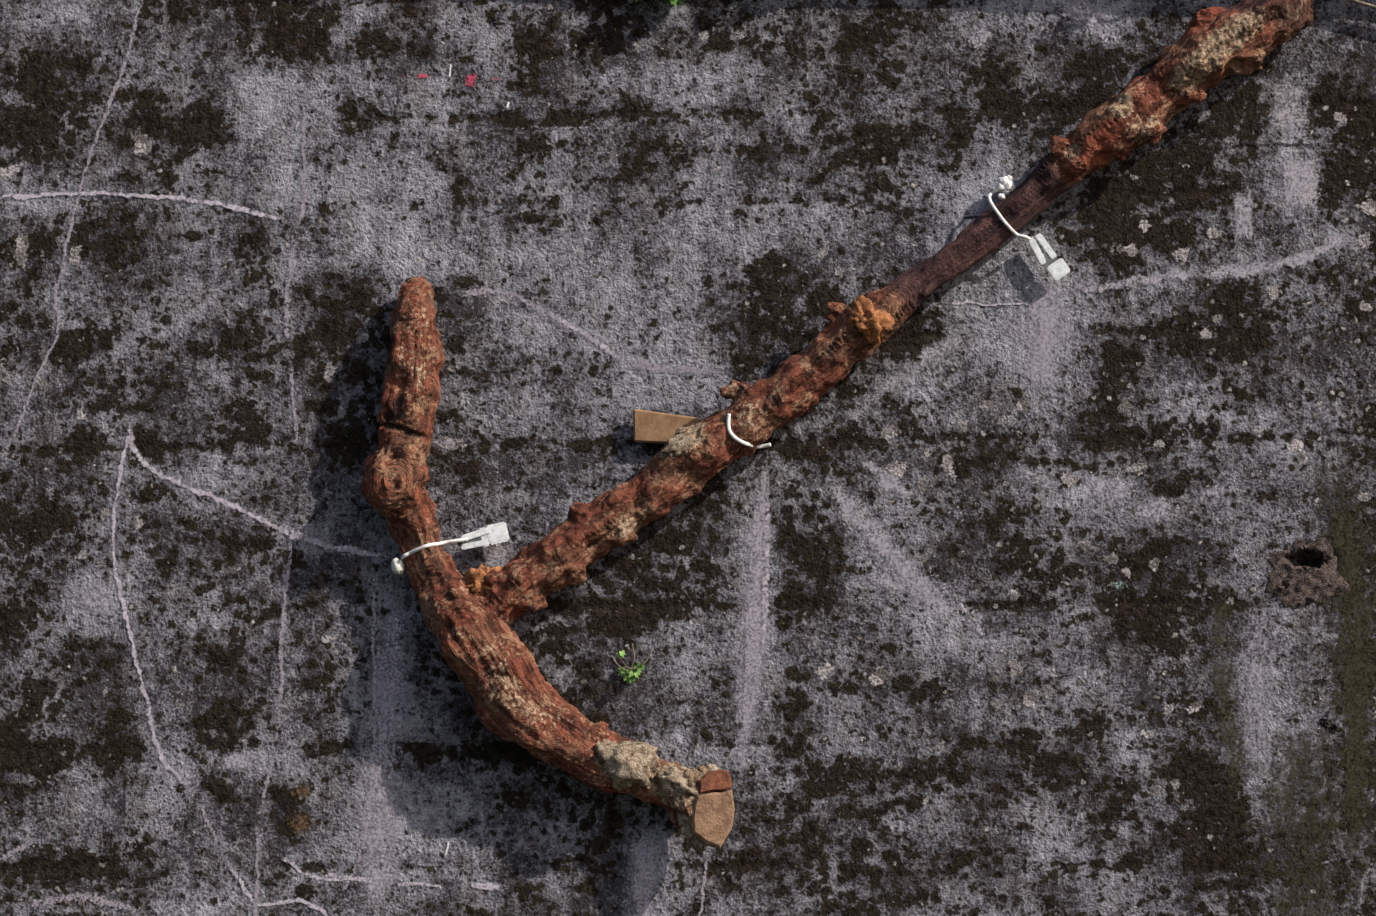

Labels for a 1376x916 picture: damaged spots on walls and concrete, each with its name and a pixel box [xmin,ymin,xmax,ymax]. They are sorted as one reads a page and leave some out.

damp [848,336,965,422]
damp [1003,233,1346,388]
damp [862,460,909,505]
damp [734,457,775,762]
damp [829,483,985,644]
spalling [1265,537,1350,610]
damp [352,599,413,916]
damp [1205,464,1376,916]
damp [627,834,663,916]